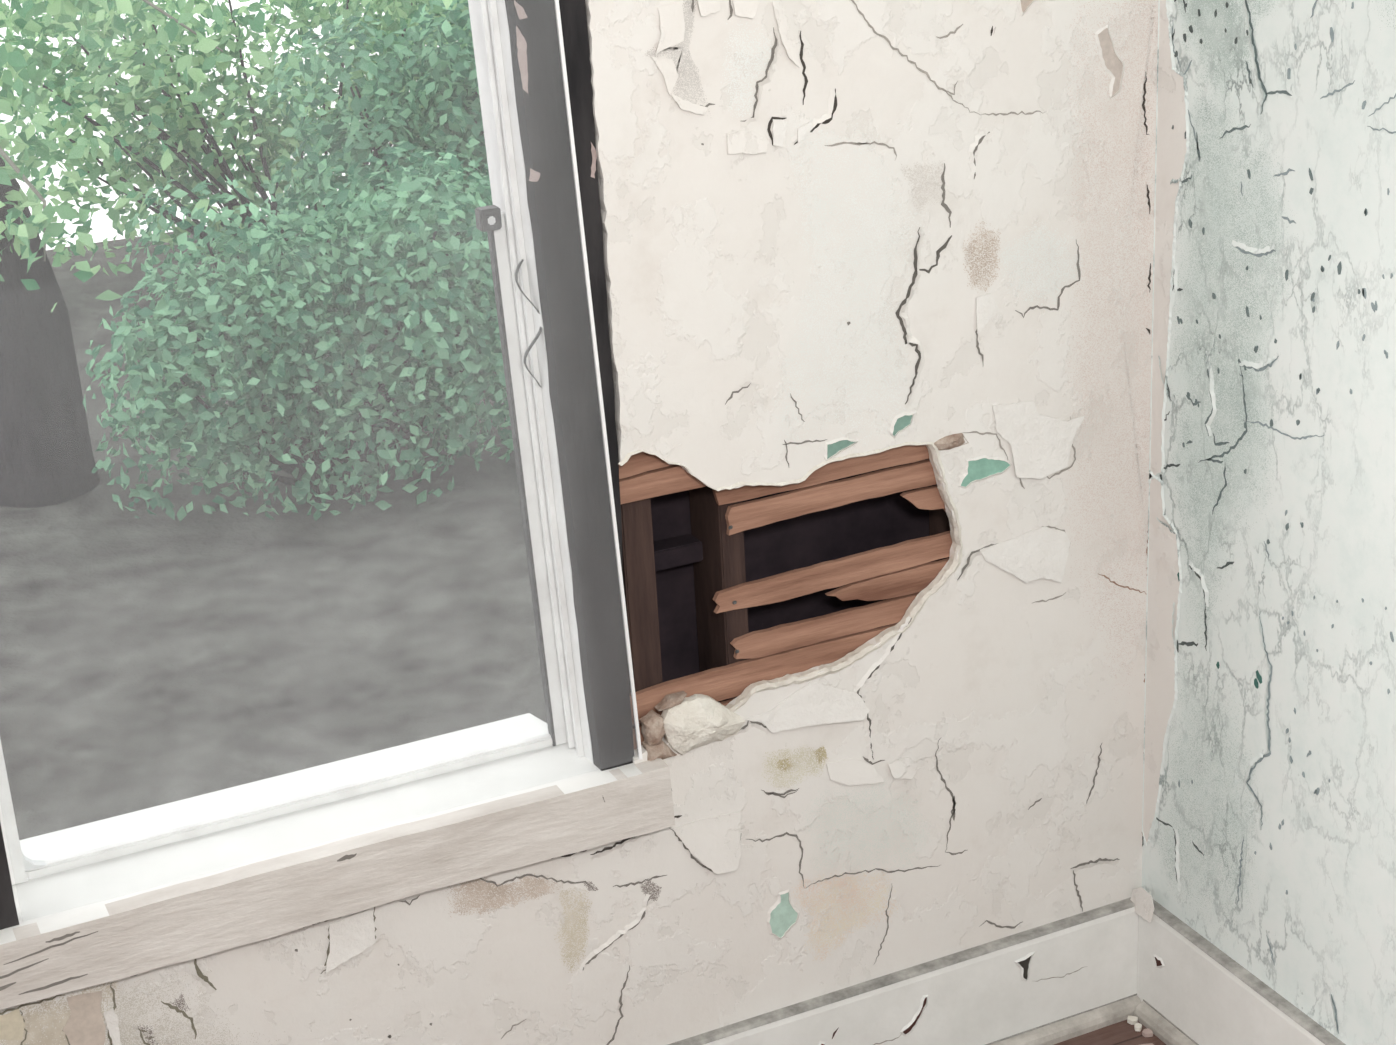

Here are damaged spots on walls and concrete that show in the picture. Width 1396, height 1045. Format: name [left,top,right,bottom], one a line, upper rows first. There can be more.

peeling [651,0,800,115]
peeling [727,119,814,154]
crack [700,26,897,160]
crack [851,0,1047,406]
peeling [1016,0,1054,16]
crack [1147,0,1355,214]
spalling [618,401,1085,750]
water stain [1060,0,1300,935]
crack [1146,262,1324,515]
peeling [103,1008,122,1045]
crack [480,815,713,1045]
crack [740,738,967,964]